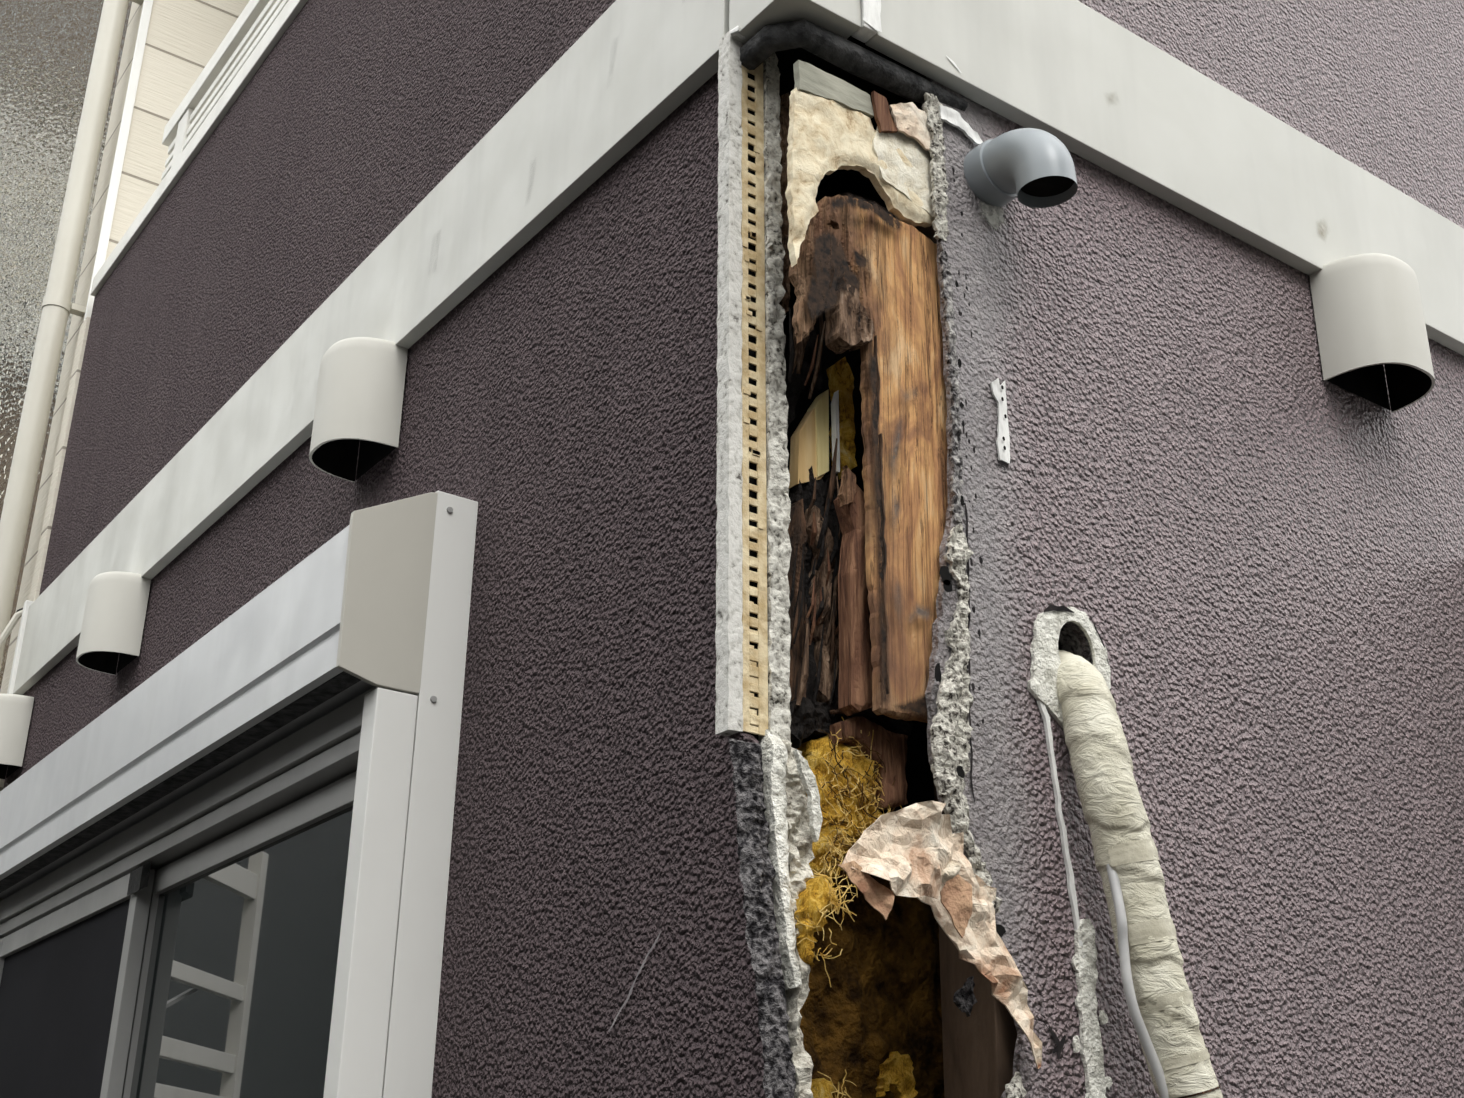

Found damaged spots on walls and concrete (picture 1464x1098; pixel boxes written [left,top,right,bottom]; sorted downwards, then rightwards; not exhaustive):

spalling [922,92,1006,937]
spalling [1027,604,1111,728]
spalling [728,729,823,1098]
spalling [1005,1072,1027,1098]